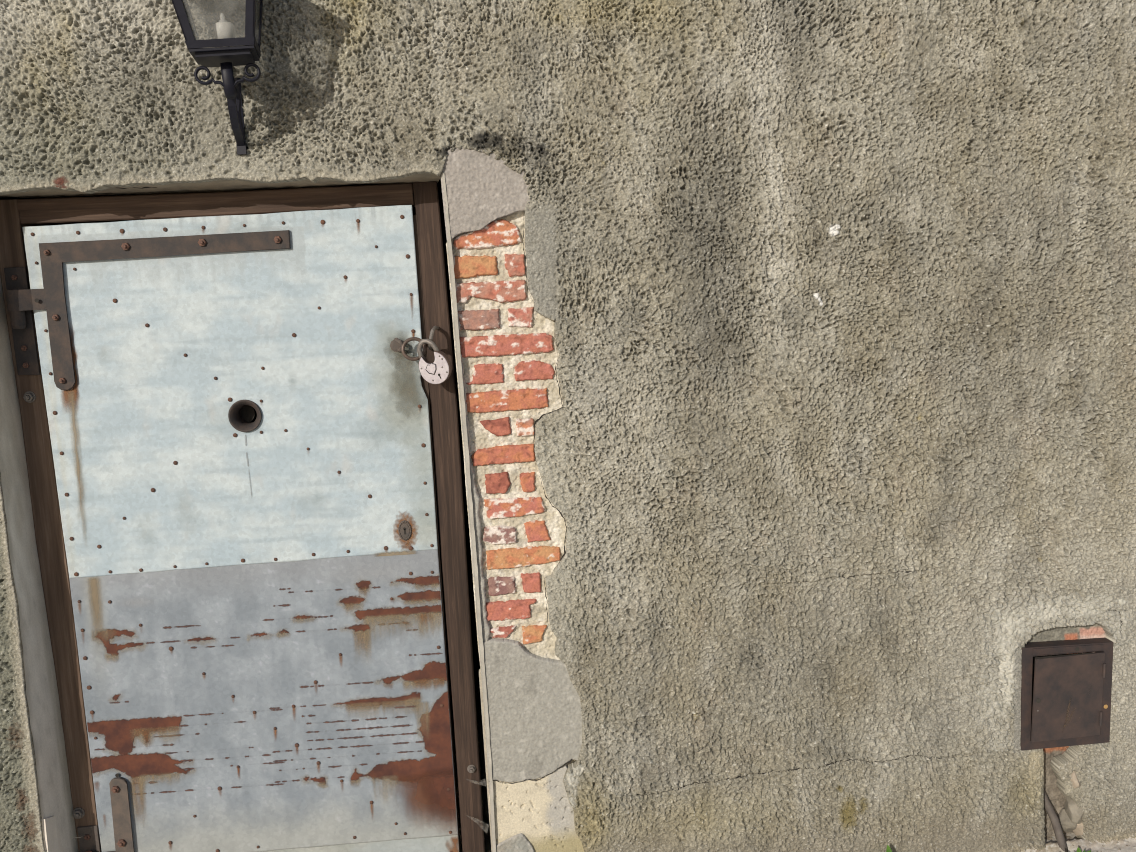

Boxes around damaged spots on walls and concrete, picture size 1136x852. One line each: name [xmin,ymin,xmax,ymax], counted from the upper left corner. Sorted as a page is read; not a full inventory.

corrosion [63,334,82,505]
spalling [446,211,567,669]
corrosion [79,579,143,658]
corrosion [340,576,442,642]
corrosion [87,716,191,799]
corrosion [334,661,456,821]
flaking render [489,764,584,852]